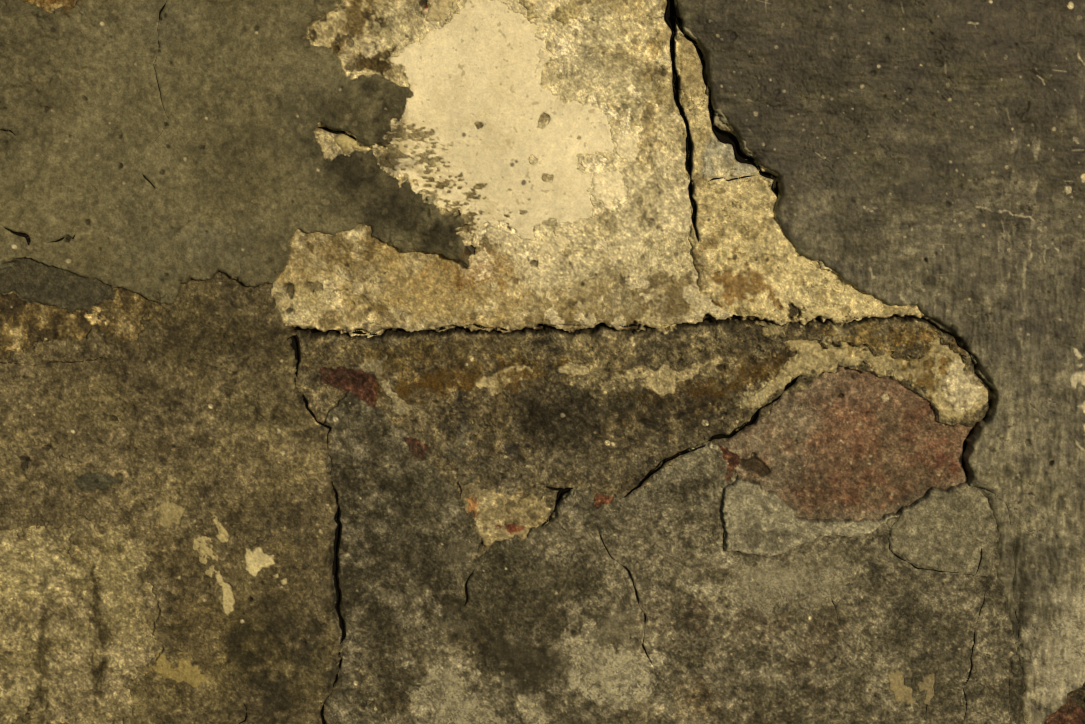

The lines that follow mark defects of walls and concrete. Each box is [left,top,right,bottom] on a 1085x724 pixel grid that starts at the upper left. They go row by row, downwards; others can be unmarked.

spalling [26,0,78,13]
crack [154,1,169,141]
crack [665,0,778,241]
spalling [0,258,170,359]
spalling [271,0,992,559]
crack [620,375,806,499]
crack [287,323,671,724]